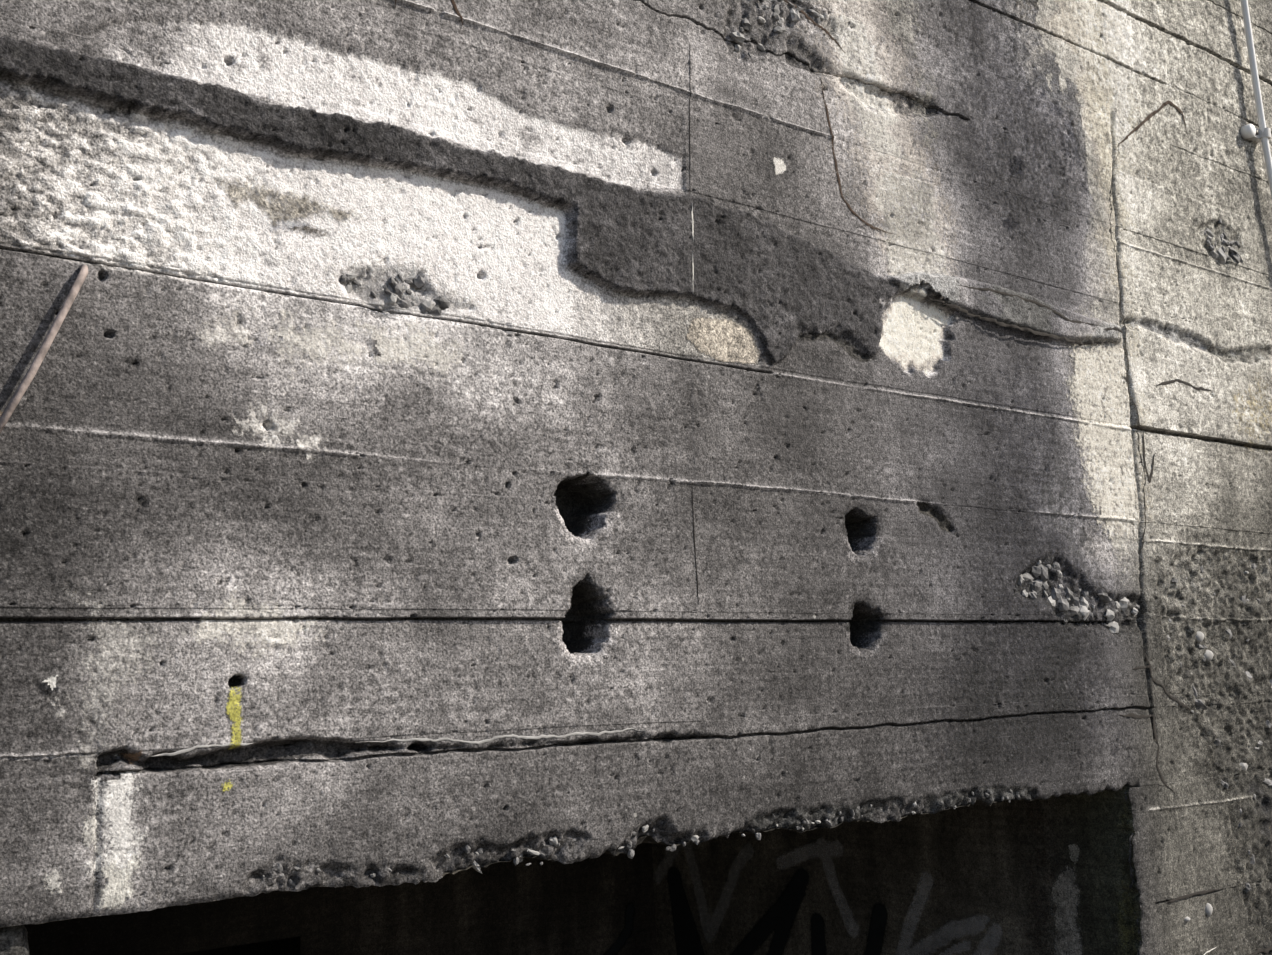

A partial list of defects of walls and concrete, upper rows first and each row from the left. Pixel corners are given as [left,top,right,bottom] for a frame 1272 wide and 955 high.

crack [784,0,845,53]
crack [686,67,694,146]
spalling [0,15,951,376]
crack [821,81,893,234]
crack [688,203,696,280]
crack [1104,100,1211,606]
crack [1117,647,1191,795]
spalling [244,830,588,895]
spalling [613,818,706,859]
spalling [729,785,1037,840]